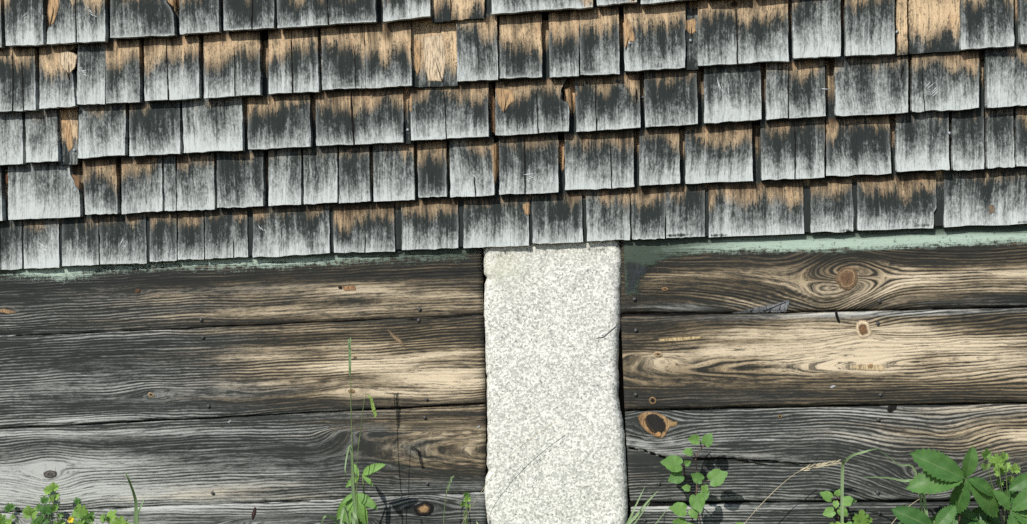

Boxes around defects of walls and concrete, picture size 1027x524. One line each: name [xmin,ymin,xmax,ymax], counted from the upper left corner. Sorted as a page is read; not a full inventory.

spalling [47,0,59,27]
spalling [59,51,77,74]